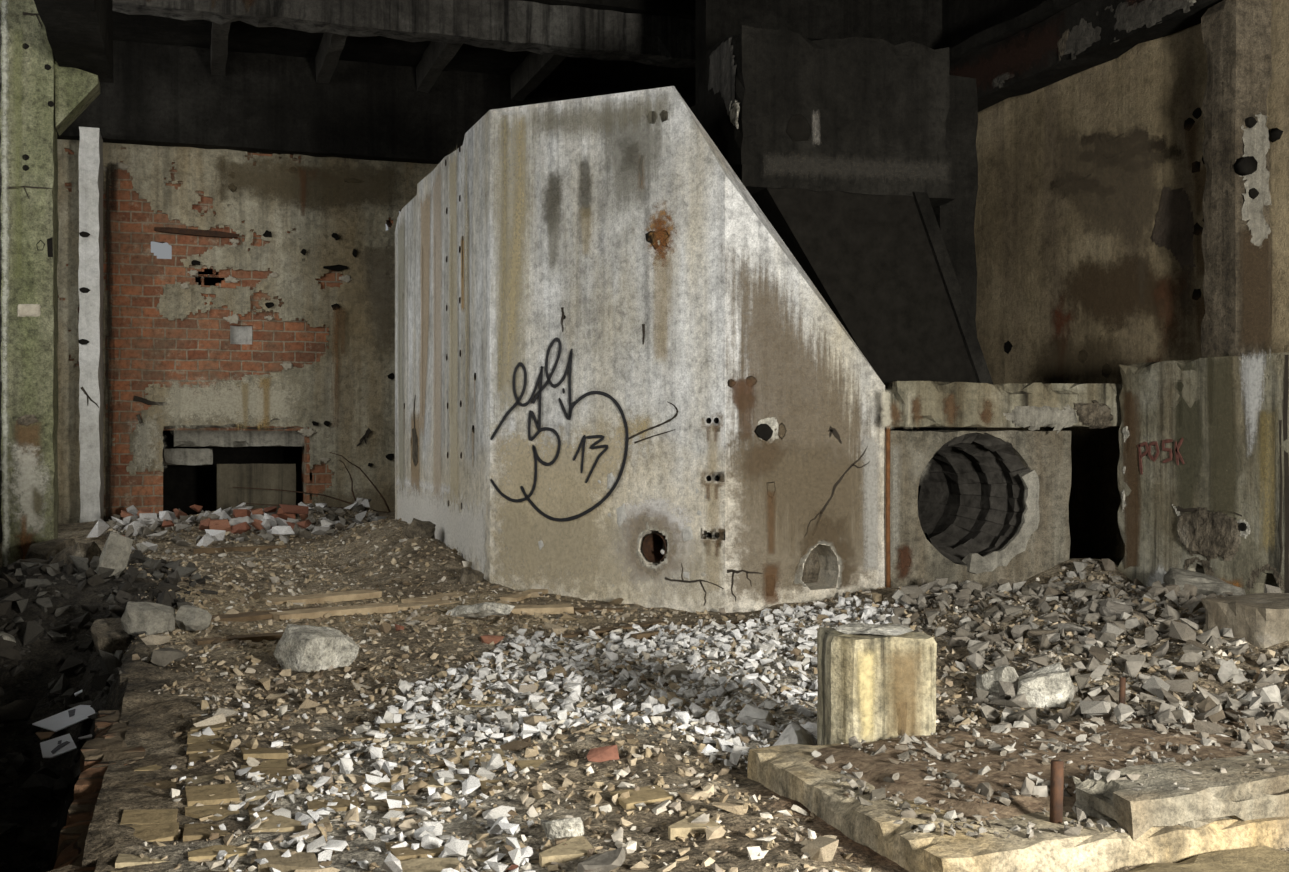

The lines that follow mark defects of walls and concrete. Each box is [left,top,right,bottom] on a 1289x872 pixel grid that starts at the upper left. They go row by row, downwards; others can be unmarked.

peeling [1057,0,1196,61]
water stain [545,176,560,227]
water stain [580,162,591,215]
spalling [1241,112,1272,246]
spalling [36,237,53,257]
peeling [315,249,357,289]
rust [647,209,674,259]
peeling [79,161,334,520]
spalling [1172,504,1251,576]